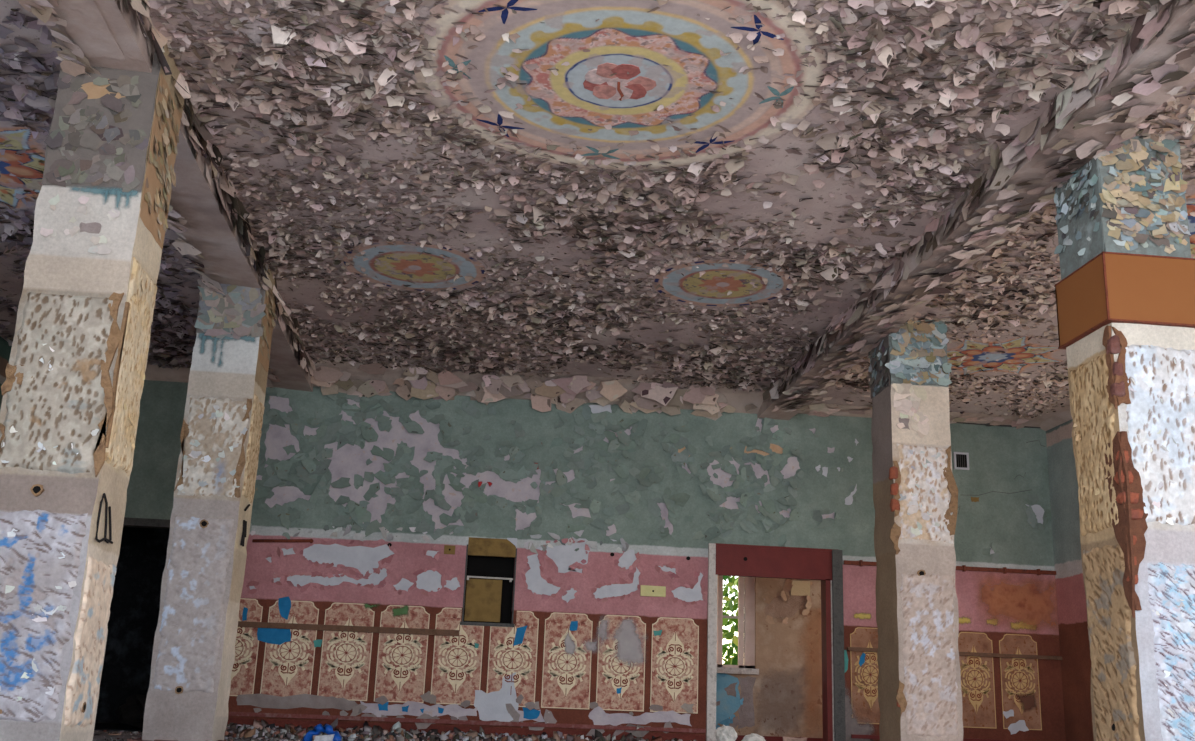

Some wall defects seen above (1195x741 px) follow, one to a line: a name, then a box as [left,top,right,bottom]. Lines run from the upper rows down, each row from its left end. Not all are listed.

peeling [0,0,1195,555]
spalling [1070,325,1195,741]
spalling [152,516,234,694]
peeling [271,539,397,593]
peeling [392,568,464,596]
peeling [521,530,597,600]
peeling [655,562,708,607]
leakage [980,579,1058,630]
spalling [896,570,959,737]
peeling [236,691,477,729]
peeling [506,694,557,731]
peeling [586,702,694,737]